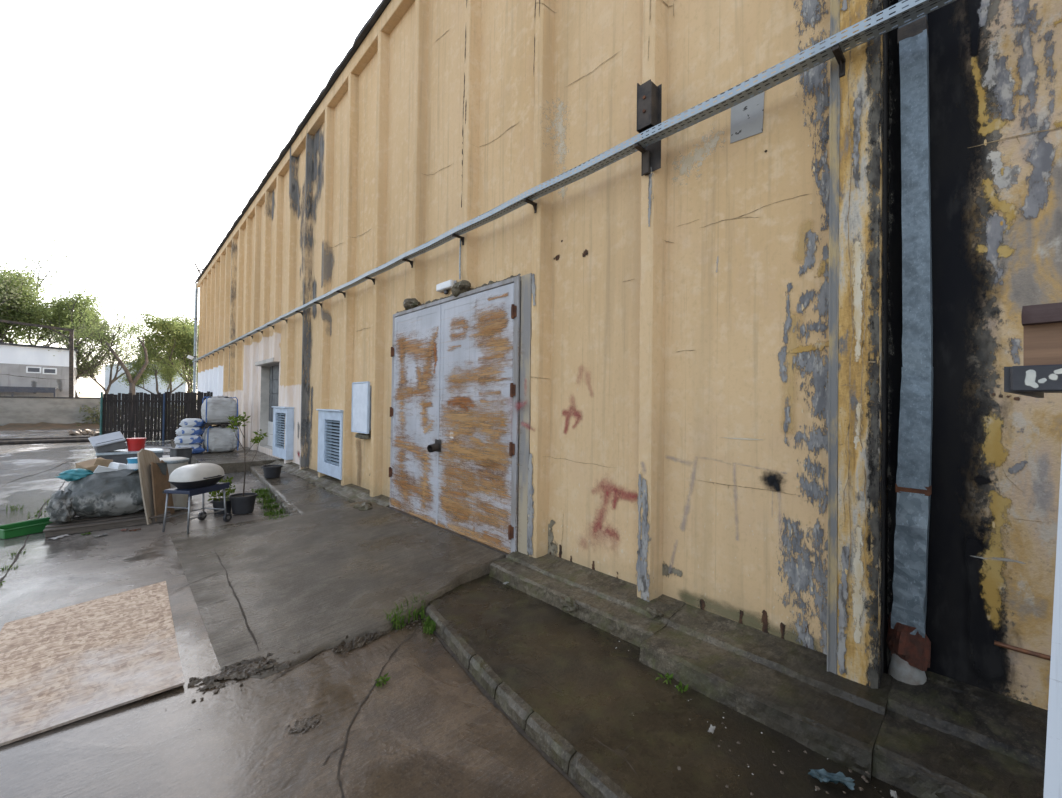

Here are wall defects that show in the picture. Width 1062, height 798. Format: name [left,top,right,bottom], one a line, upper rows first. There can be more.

peeling [971,41,1021,258]
damp [289,129,334,468]
corrosion [390,292,512,554]
peeling [636,471,682,602]
peeling [778,0,865,675]
damp [925,0,1056,705]
peeling [981,413,1009,469]
peeling [973,490,1023,628]
crack [323,619,421,798]